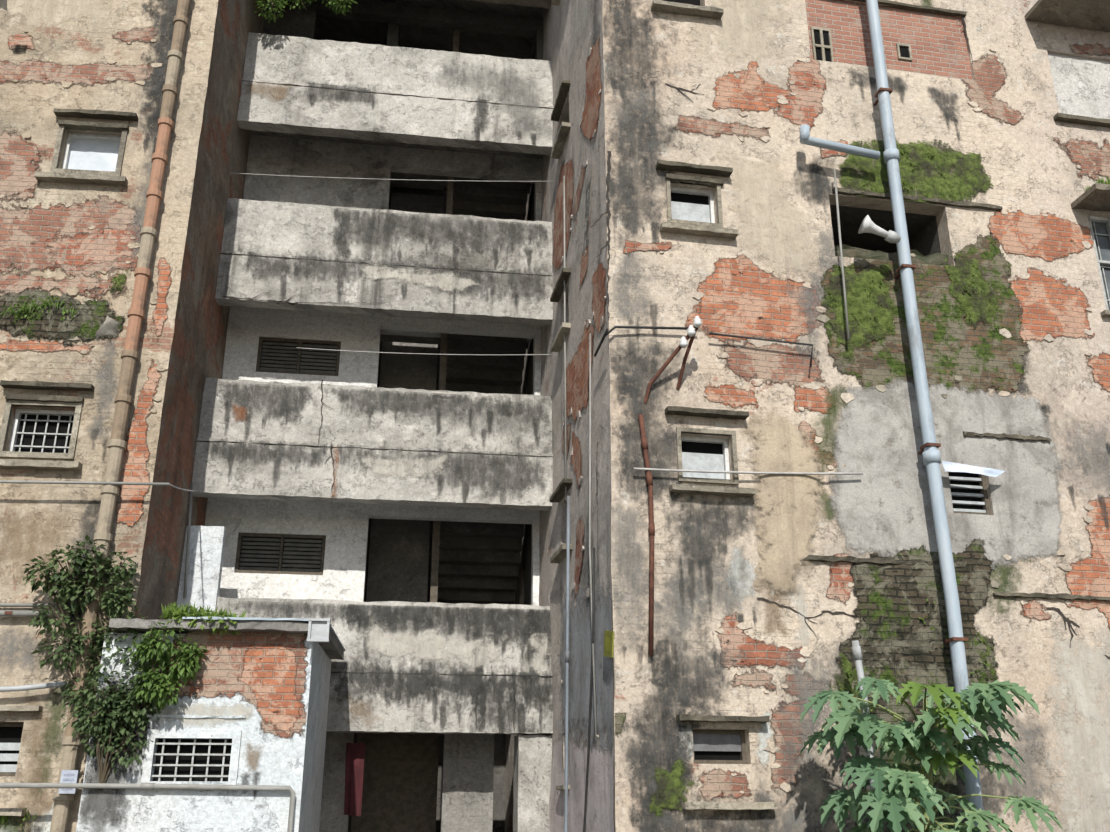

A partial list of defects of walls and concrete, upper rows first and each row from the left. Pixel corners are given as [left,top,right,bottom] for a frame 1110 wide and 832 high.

damp [571,0,678,264]
spalling [674,55,826,143]
spalling [0,129,141,355]
damp [245,209,548,311]
spalling [685,207,1110,470]
damp [211,383,545,502]
spalling [158,631,308,739]
damp [245,601,551,734]
damp [624,496,841,832]
crack [757,598,864,637]
spalling [715,539,1012,793]
spalling [1056,493,1110,629]